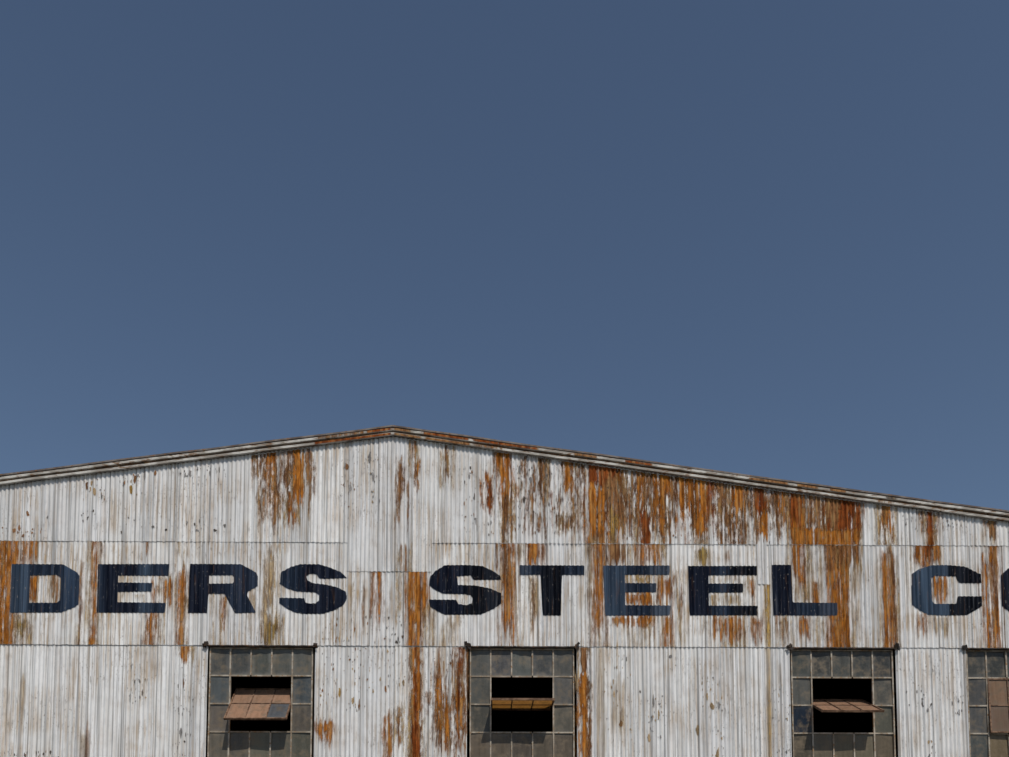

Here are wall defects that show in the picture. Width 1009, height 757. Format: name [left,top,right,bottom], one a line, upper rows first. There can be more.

rust [0,541,38,644]
rust [30,575,58,603]
rust [145,562,195,662]
rust [252,428,900,757]
rust [914,510,952,603]
rust [978,519,1005,648]